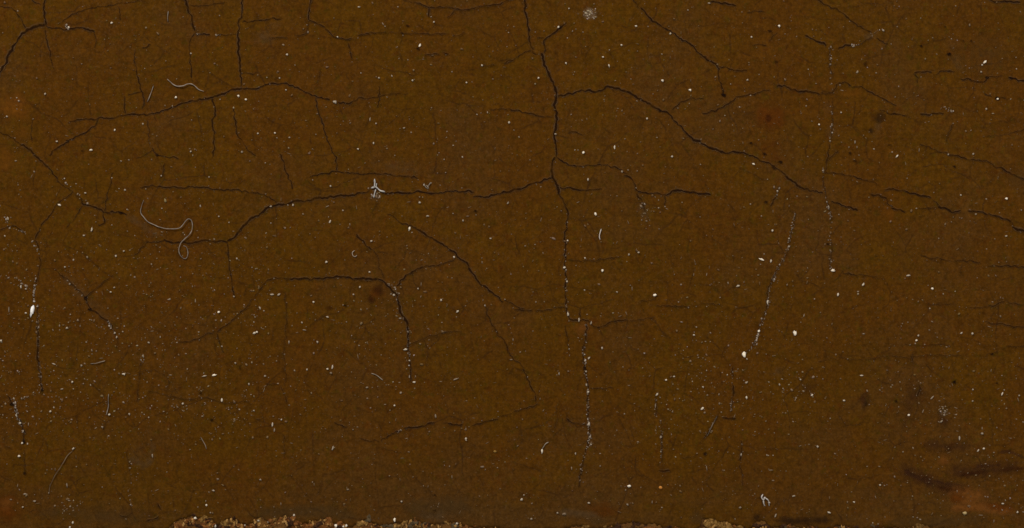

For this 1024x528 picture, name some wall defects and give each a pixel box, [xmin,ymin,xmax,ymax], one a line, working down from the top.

crack [0,0,416,474]
crack [276,0,1024,485]